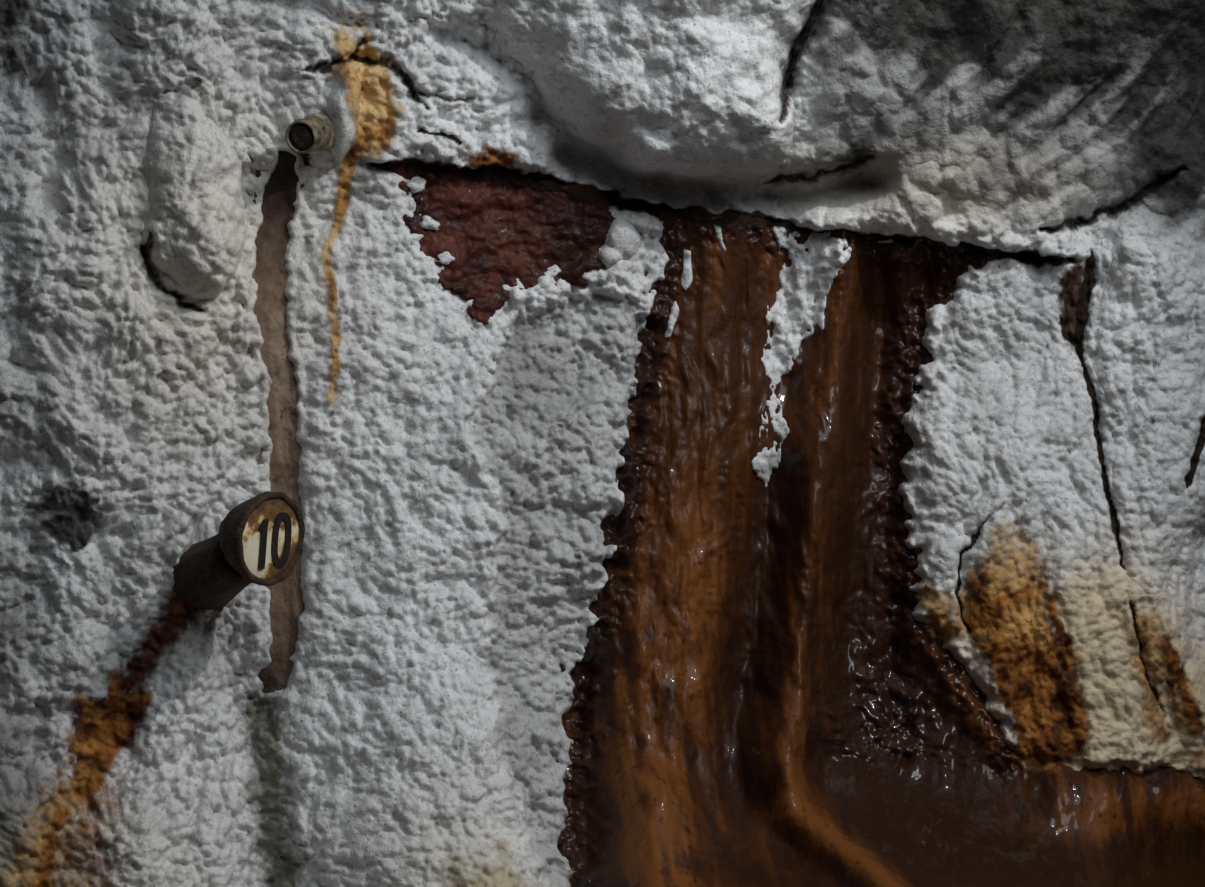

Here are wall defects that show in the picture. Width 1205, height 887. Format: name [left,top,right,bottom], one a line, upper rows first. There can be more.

rust [322,22,403,403]
spalling [388,161,615,324]
rust [556,207,1205,887]
crack [842,168,1181,569]
rust [2,589,205,887]